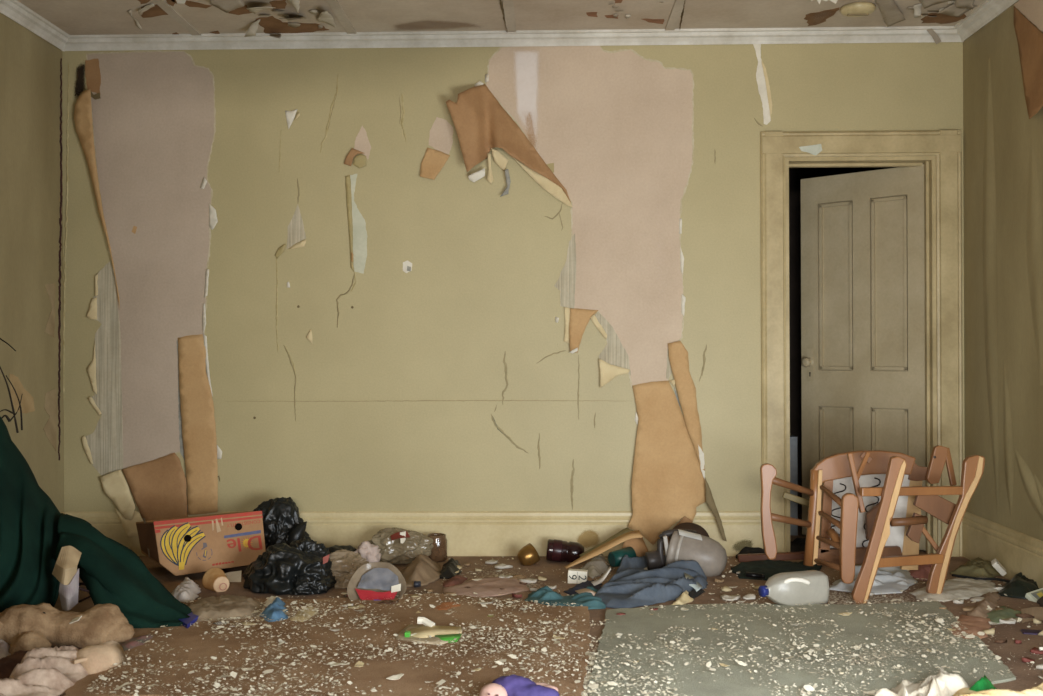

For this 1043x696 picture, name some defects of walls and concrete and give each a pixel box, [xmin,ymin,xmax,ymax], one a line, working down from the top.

peeling [127,0,336,39]
peeling [804,0,839,26]
peeling [875,0,977,44]
flaking render [1014,0,1043,32]
peeling [753,44,772,126]
peeling [344,125,371,168]
peeling [420,117,453,180]
flaking render [468,46,693,388]
flaking render [87,52,218,469]
crack [229,346,606,469]